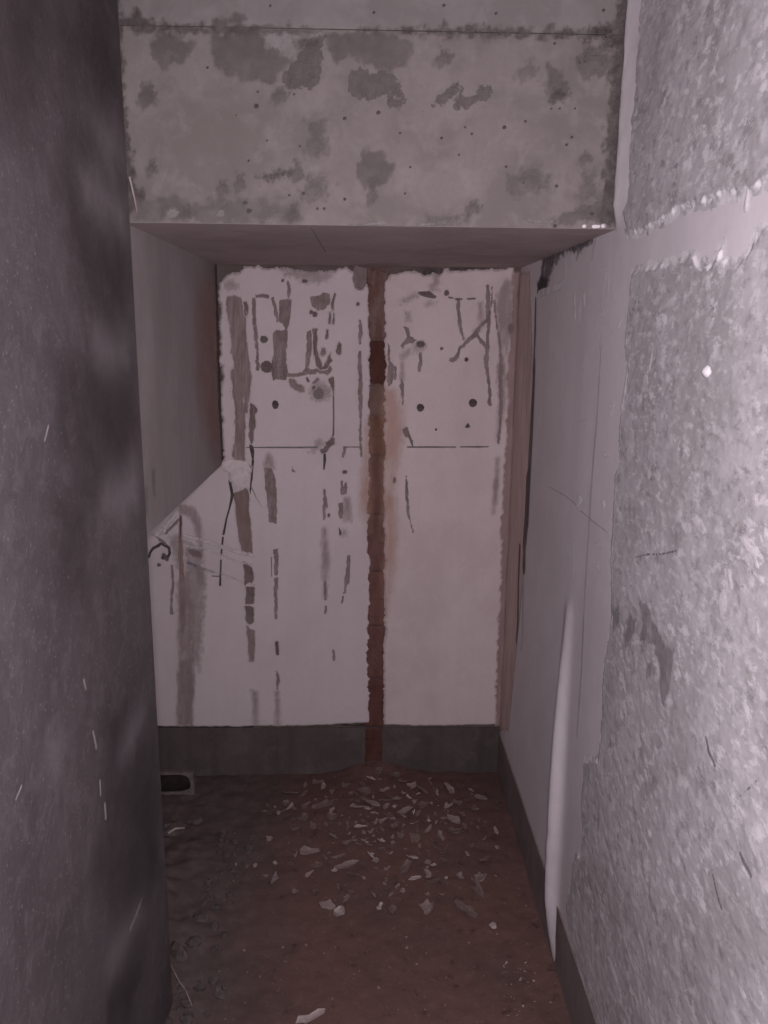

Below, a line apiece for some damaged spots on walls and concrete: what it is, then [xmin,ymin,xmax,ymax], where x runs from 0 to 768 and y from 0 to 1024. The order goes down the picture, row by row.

water stain [119,8,287,100]
water stain [427,25,573,39]
water stain [560,0,627,225]
water stain [358,152,394,201]
water stain [252,279,337,439]
crack [212,445,317,586]
water stain [264,456,277,524]
water stain [170,507,255,725]
water stain [271,549,279,619]